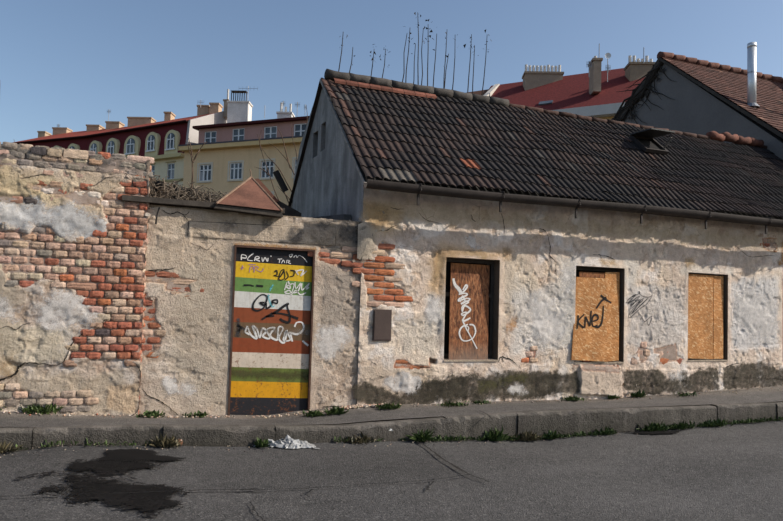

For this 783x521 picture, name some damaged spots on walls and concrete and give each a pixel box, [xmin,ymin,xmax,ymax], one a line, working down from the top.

spalling [0,142,204,367]
spalling [307,242,413,311]
crack [0,320,105,381]
crack [131,364,178,416]
damp [350,369,581,404]
damp [623,361,783,395]
damp [5,457,195,520]
crack [287,440,490,497]